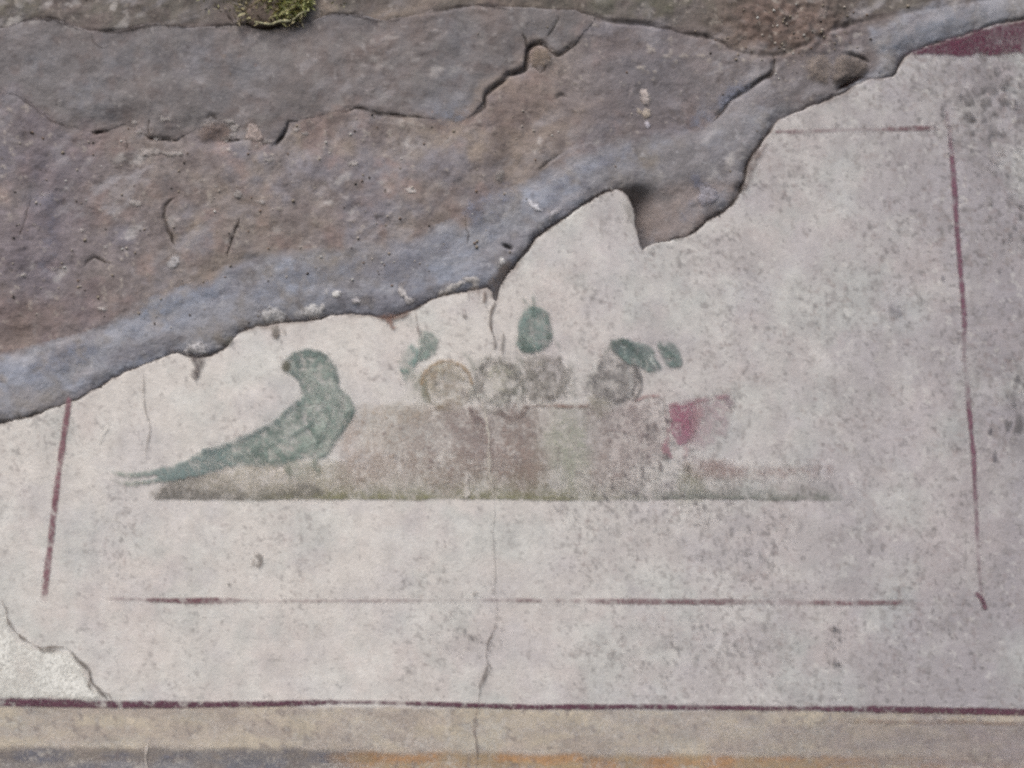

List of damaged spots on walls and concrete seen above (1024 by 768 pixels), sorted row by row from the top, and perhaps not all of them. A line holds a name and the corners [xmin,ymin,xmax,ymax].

crack [476,18,572,114]
spalling [0,0,1024,424]
crack [490,300,504,350]
crack [6,608,110,699]